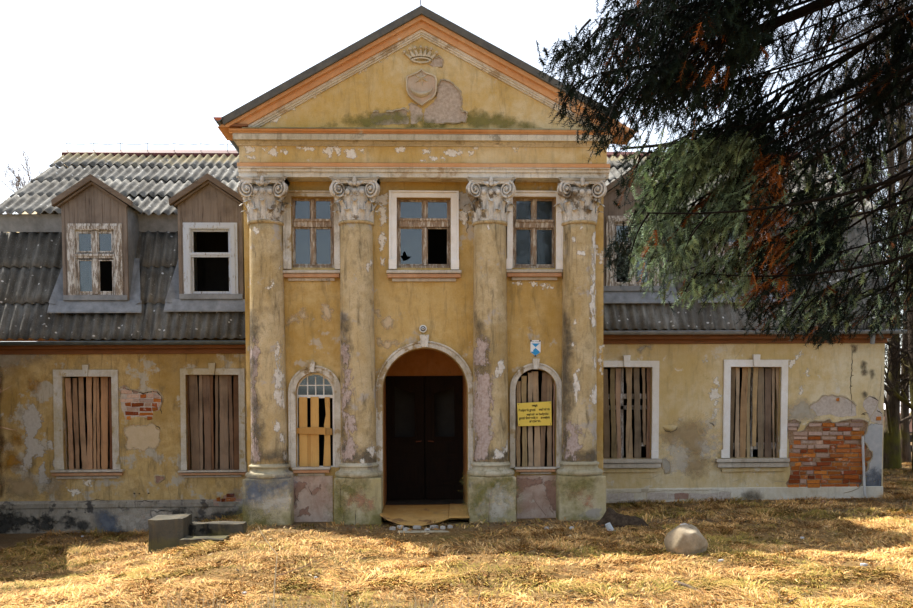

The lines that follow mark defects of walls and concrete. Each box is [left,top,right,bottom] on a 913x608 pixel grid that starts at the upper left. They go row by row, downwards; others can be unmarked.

spalling [371,79,468,125]
leakage [466,111,534,128]
peeling [243,146,364,159]
peeling [420,147,479,161]
flaking render [118,385,164,420]
peeling [473,338,508,462]
flaking render [19,403,55,487]
flaking render [786,386,882,493]
flaking render [294,482,321,517]
leakage [0,511,141,534]